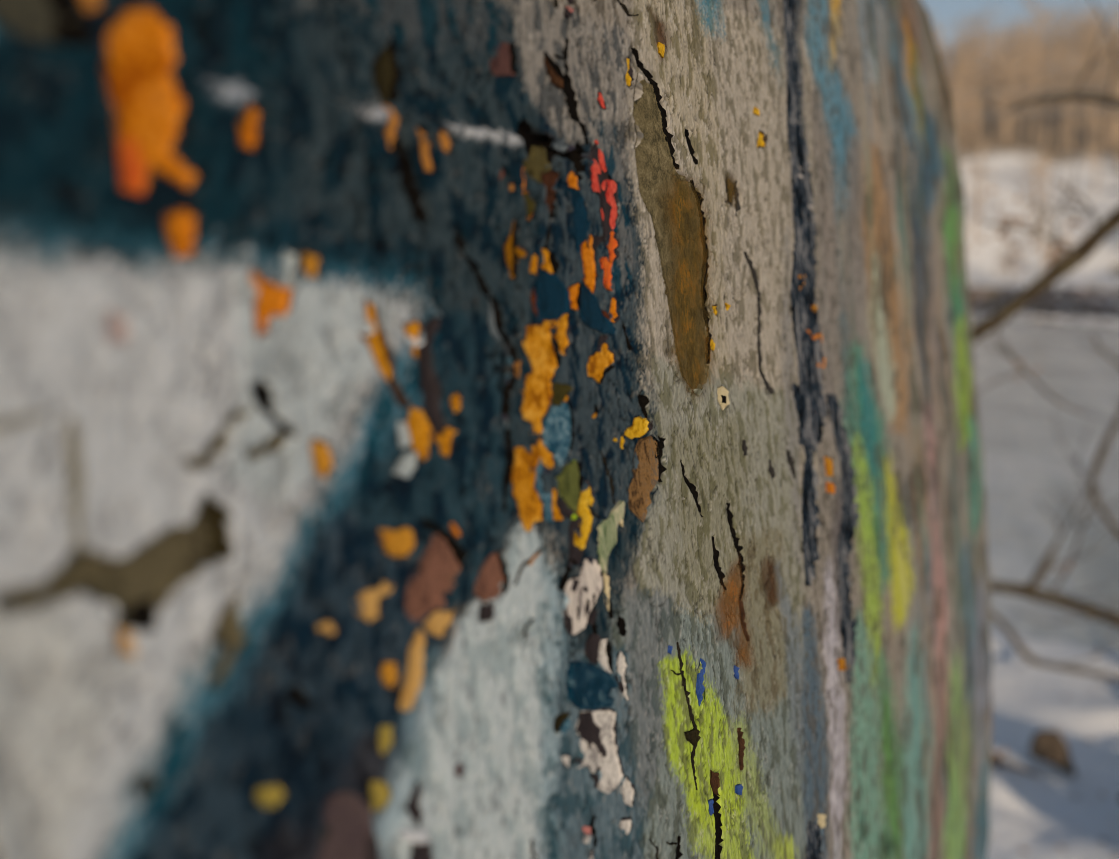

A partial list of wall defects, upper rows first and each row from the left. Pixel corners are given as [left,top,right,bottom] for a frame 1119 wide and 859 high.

crack [544,38,589,144]
spalling [625,58,731,396]
crack [631,48,741,364]
peeling [359,298,461,478]
spalling [354,518,468,711]
spalling [474,552,510,621]
peeling [499,140,659,835]
crack [649,836,683,859]
crack [637,390,750,641]
peeling [696,658,706,706]
crack [671,642,745,859]
crack [742,0,861,683]